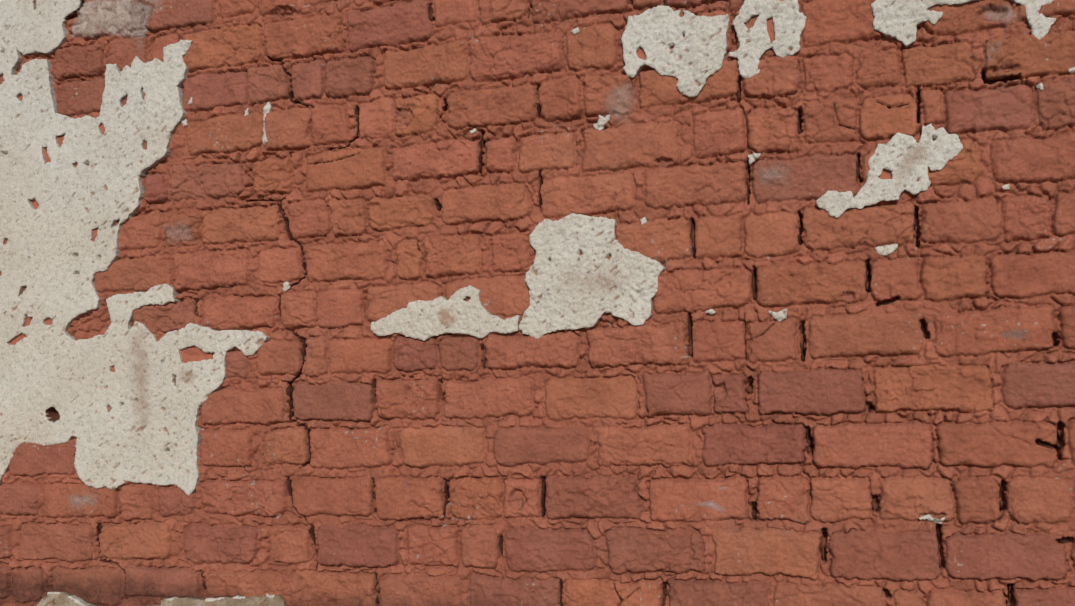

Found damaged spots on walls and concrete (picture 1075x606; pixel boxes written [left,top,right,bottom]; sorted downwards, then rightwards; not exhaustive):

peeling [871,0,1056,48]
peeling [622,0,807,98]
peeling [593,114,610,131]
peeling [816,124,963,218]
peeling [0,0,270,495]
peeling [875,244,898,256]
peeling [371,213,665,341]
peeling [769,309,787,322]
peeling [919,512,947,524]